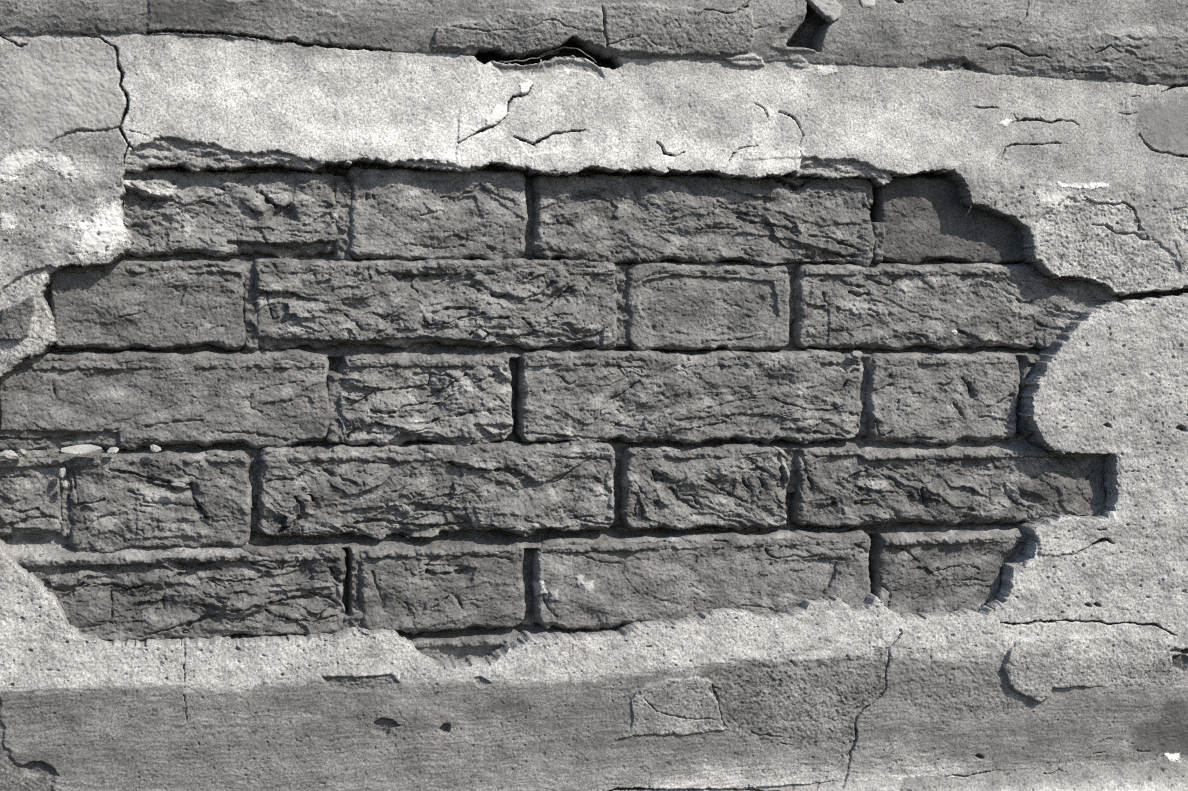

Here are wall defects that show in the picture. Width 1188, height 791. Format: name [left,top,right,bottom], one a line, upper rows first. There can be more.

spalling [807,0,842,23]
crack [146,30,390,51]
crack [987,3,1118,74]
crack [50,35,146,165]
crack [456,85,582,150]
crack [975,106,1075,154]
crack [1126,114,1188,158]
crack [1136,83,1188,91]
spalling [0,134,1188,686]
crack [1000,619,1188,654]
spalling [322,674,399,691]
crack [816,683,886,790]